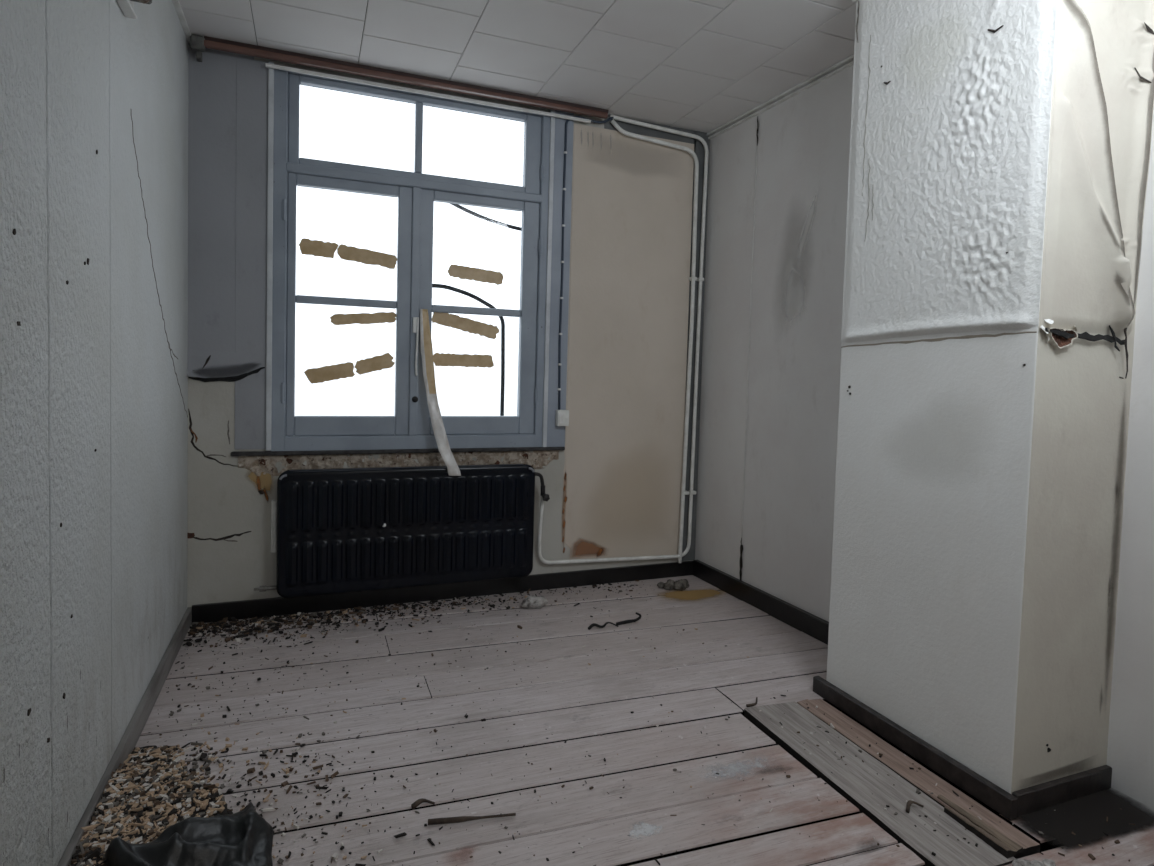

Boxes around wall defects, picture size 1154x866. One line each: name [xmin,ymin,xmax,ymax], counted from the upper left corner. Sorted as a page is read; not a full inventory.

crack [131,115,238,467]
crack [1044,325,1128,379]
spalling [238,450,559,476]
crack [187,531,251,542]